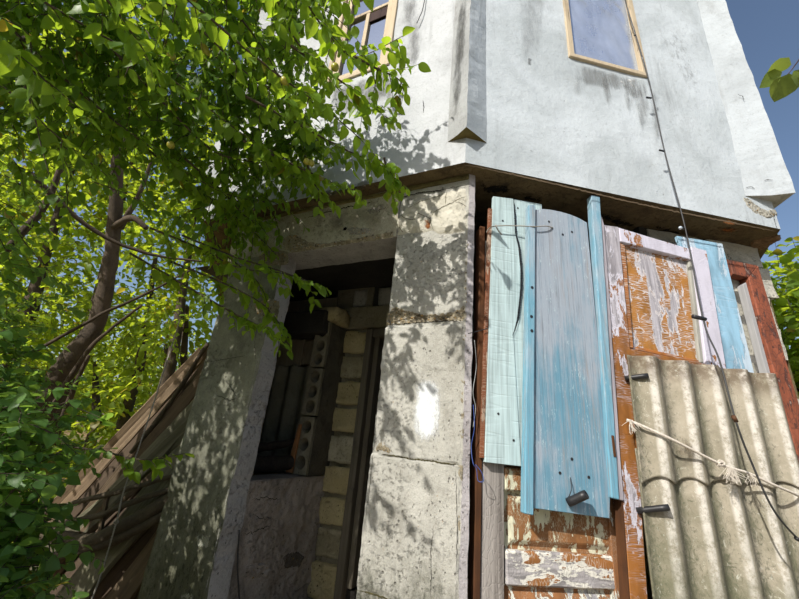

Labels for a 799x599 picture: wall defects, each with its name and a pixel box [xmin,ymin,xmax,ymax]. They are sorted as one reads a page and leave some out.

crack [399,186,464,232]
spalling [465,165,782,251]